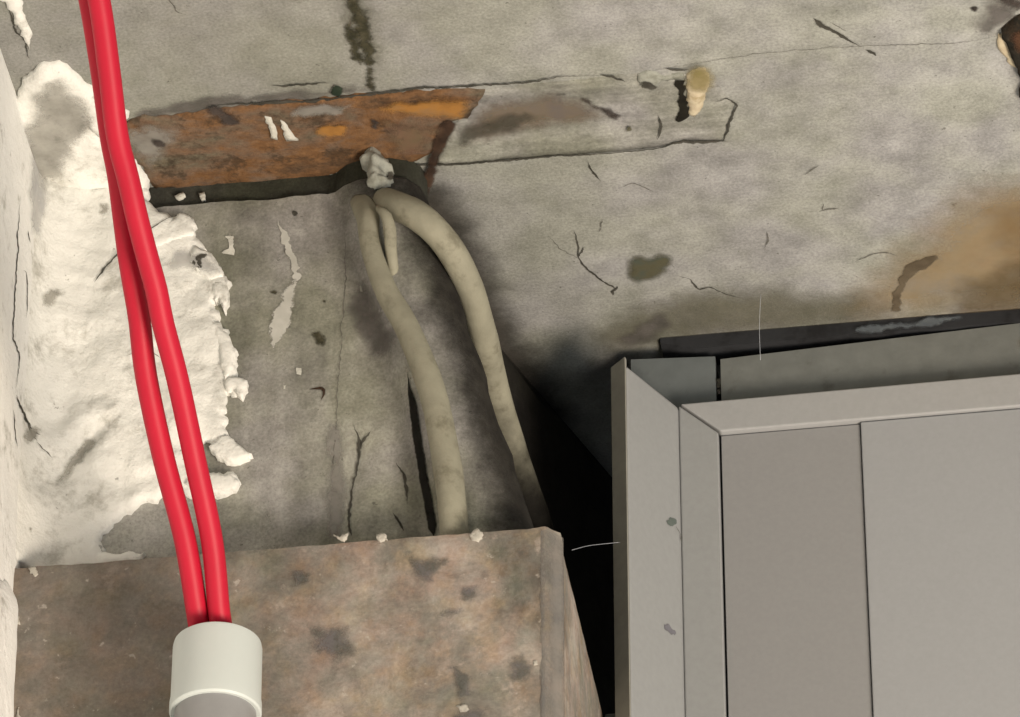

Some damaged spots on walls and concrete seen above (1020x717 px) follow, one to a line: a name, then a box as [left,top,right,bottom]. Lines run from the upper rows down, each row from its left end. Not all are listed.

damp [344,19,372,65]
crack [226,75,625,105]
spalling [638,70,689,122]
corrosion [317,125,346,136]
corrosion [384,101,467,192]
crack [553,221,618,295]
damp [629,255,670,281]
damp [892,256,938,312]
corrosion [884,196,1020,310]
crack [13,208,50,455]
crack [329,229,370,536]